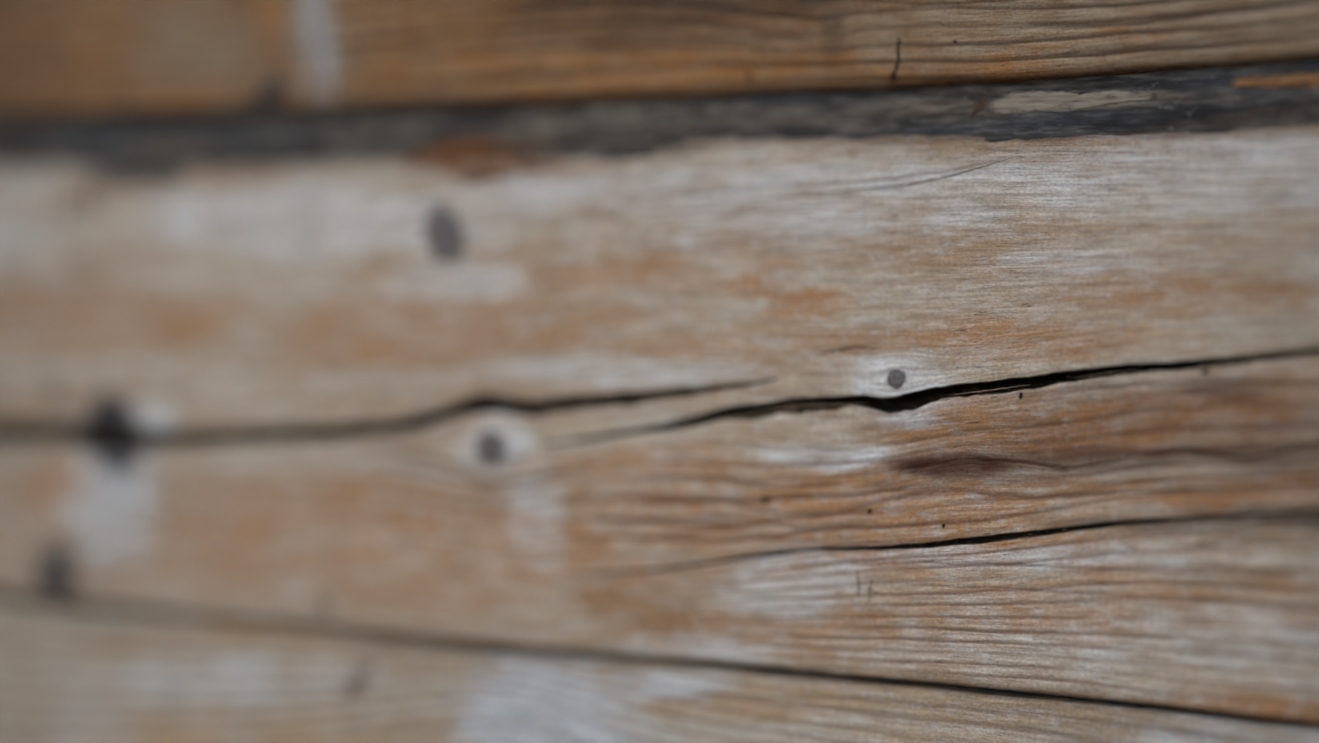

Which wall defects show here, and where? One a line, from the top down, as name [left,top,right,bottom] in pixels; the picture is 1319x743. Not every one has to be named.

crack [0,346,1319,452]
crack [582,511,1319,603]